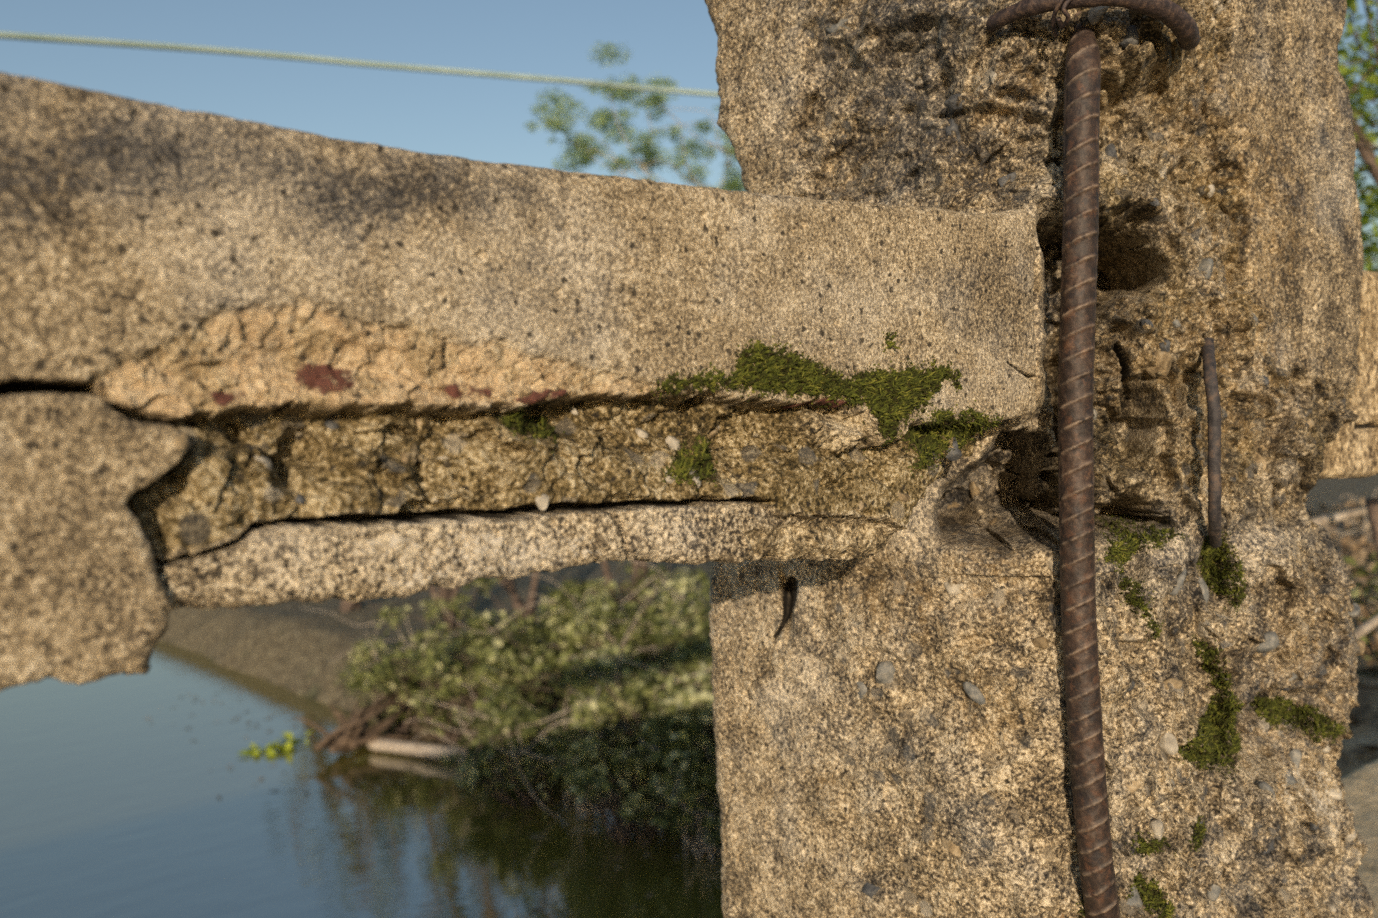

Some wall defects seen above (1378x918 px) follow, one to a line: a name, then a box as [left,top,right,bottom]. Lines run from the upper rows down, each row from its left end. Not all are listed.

crack [0,380,96,396]
crack [155,496,770,562]
spalling [81,298,974,562]
spalling [789,0,1375,918]
crack [744,576,798,723]